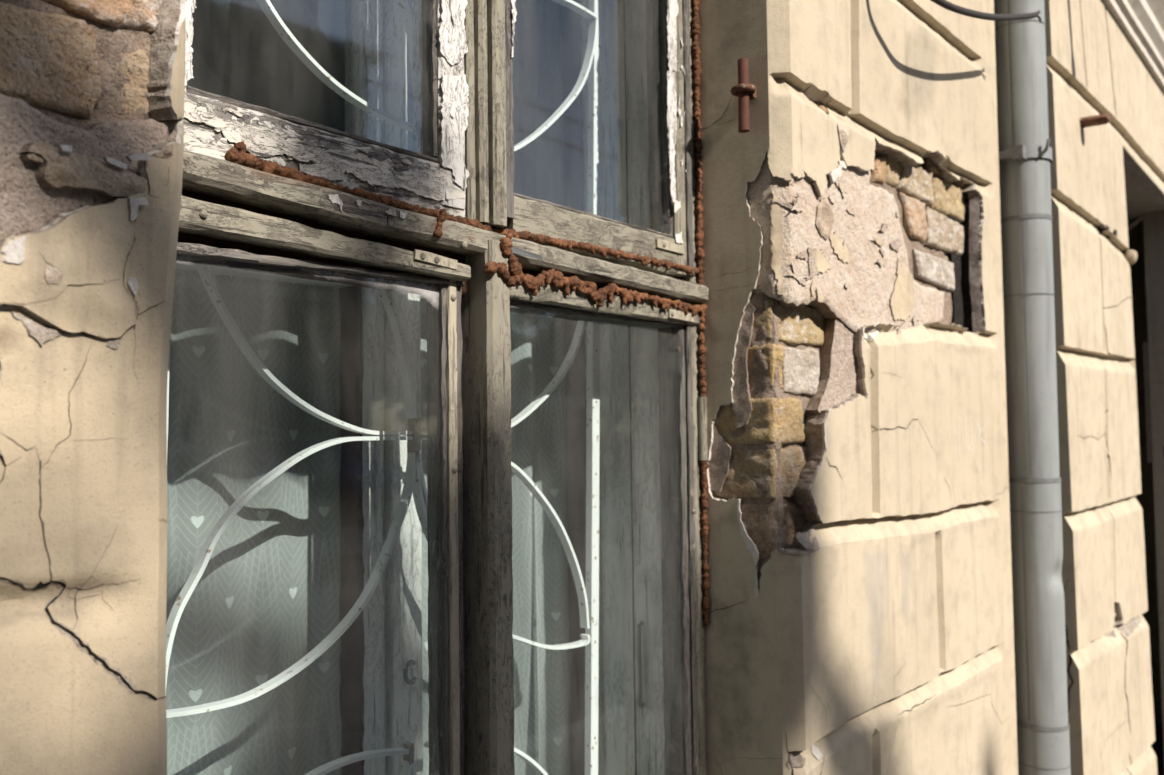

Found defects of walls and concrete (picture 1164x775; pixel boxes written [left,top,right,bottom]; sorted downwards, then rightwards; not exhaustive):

spalling [0,0,470,264]
spalling [0,306,64,346]
spalling [106,338,120,349]
spalling [708,124,983,598]
crack [0,162,169,701]
crack [871,419,951,492]
crack [1062,406,1116,480]
crack [1065,622,1074,718]
crack [1101,634,1132,775]
crack [714,732,824,775]